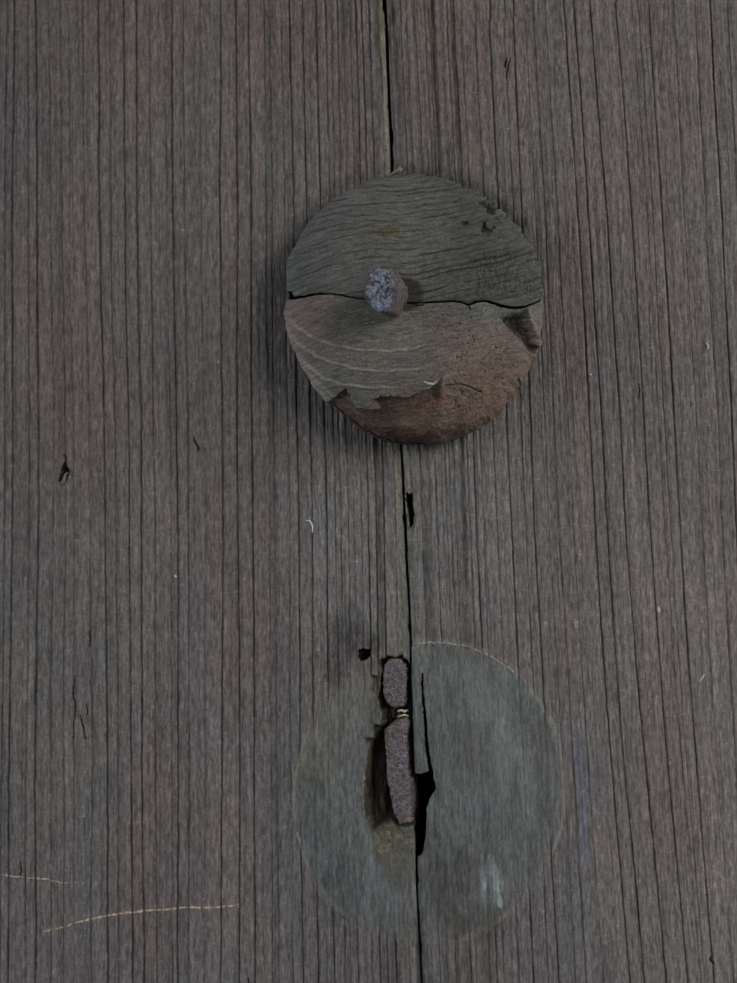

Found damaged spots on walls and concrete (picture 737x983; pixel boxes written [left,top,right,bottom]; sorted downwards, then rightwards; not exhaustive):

crack [287,291,366,301]
crack [407,300,540,310]
spalling [363,654,416,827]
rust [384,715,420,824]